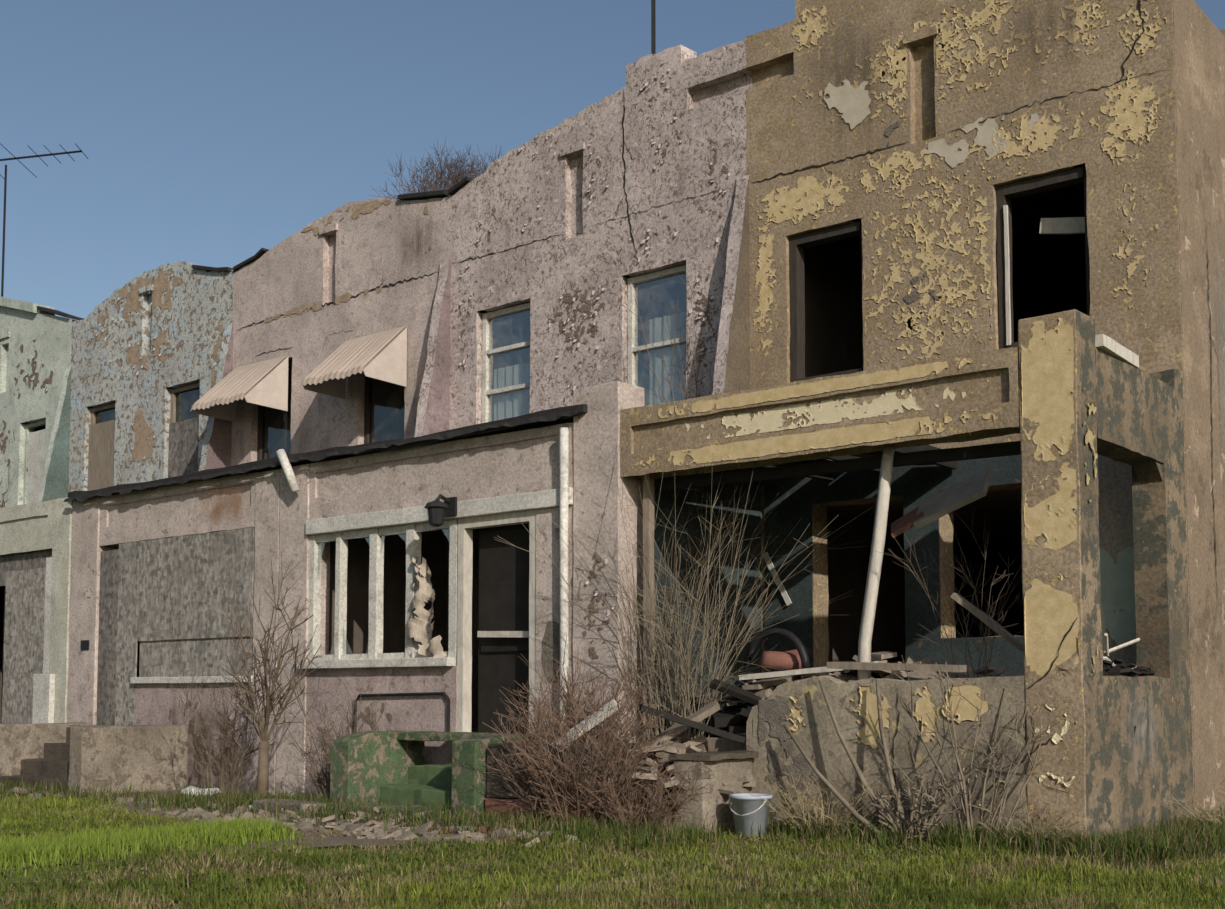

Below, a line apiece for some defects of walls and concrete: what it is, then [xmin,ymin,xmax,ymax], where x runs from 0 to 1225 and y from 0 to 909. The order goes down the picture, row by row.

crack [945,0,1164,133]
spalling [627,208,683,262]
crack [589,91,908,266]
peeling [640,0,1167,467]
peeling [91,270,187,376]
peeling [1021,317,1100,550]
peeling [1024,546,1136,677]
spalling [758,695,821,810]
peeling [851,686,892,755]
peeling [913,685,988,742]
peeling [1034,703,1078,744]
peeling [1039,771,1076,787]